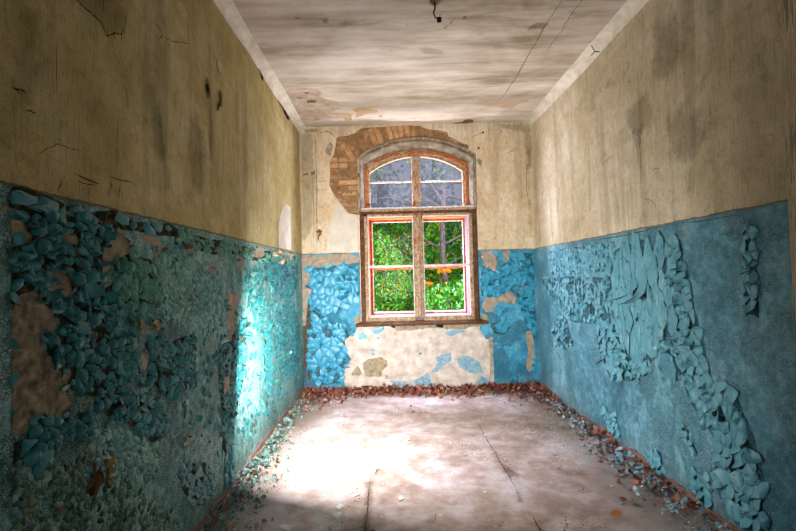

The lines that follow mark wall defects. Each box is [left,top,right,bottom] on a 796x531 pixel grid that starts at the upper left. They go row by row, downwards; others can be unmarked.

crack [77,0,127,41]
crack [503,0,582,96]
flaking render [278,88,469,215]